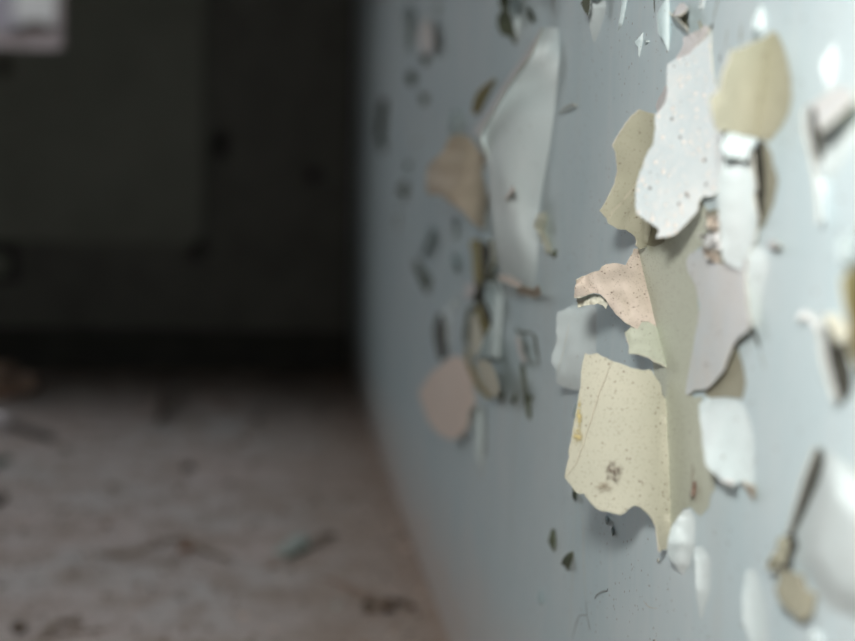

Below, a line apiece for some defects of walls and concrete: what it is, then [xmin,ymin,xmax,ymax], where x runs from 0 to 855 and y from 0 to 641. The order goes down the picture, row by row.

peeling [472,78,496,115]
peeling [419,134,542,440]
peeling [548,0,792,620]